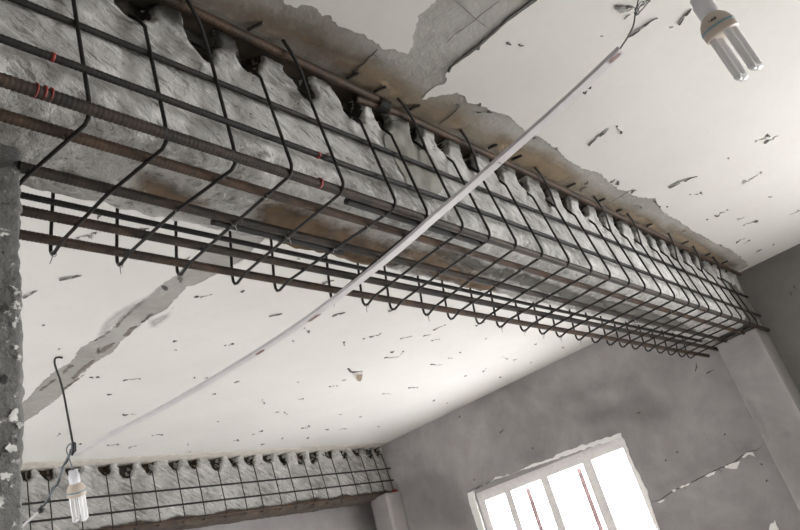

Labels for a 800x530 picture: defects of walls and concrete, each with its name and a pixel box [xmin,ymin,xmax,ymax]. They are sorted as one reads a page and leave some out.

spalling [448,0,537,73]
peeling [614,0,651,20]
corrosion [138,176,203,206]
spalling [63,300,144,389]
peeling [329,368,363,387]
crack [653,444,764,503]